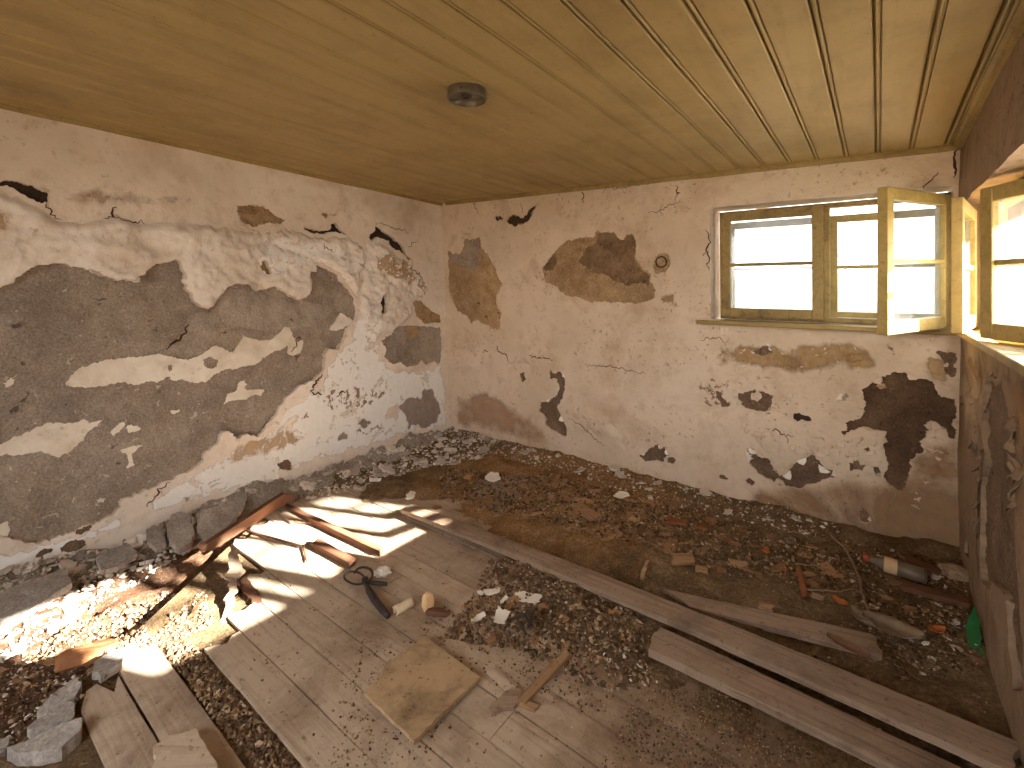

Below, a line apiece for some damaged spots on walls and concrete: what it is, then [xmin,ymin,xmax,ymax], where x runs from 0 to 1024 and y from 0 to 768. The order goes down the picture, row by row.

crack [369,223,428,291]
flaking render [448,237,503,330]
flaking render [543,230,671,305]
flaking render [736,343,782,368]
flaking render [0,247,443,559]
flaking render [540,371,567,436]
flaking render [745,447,838,488]
flaking render [841,372,959,509]
flaking render [974,375,1023,678]